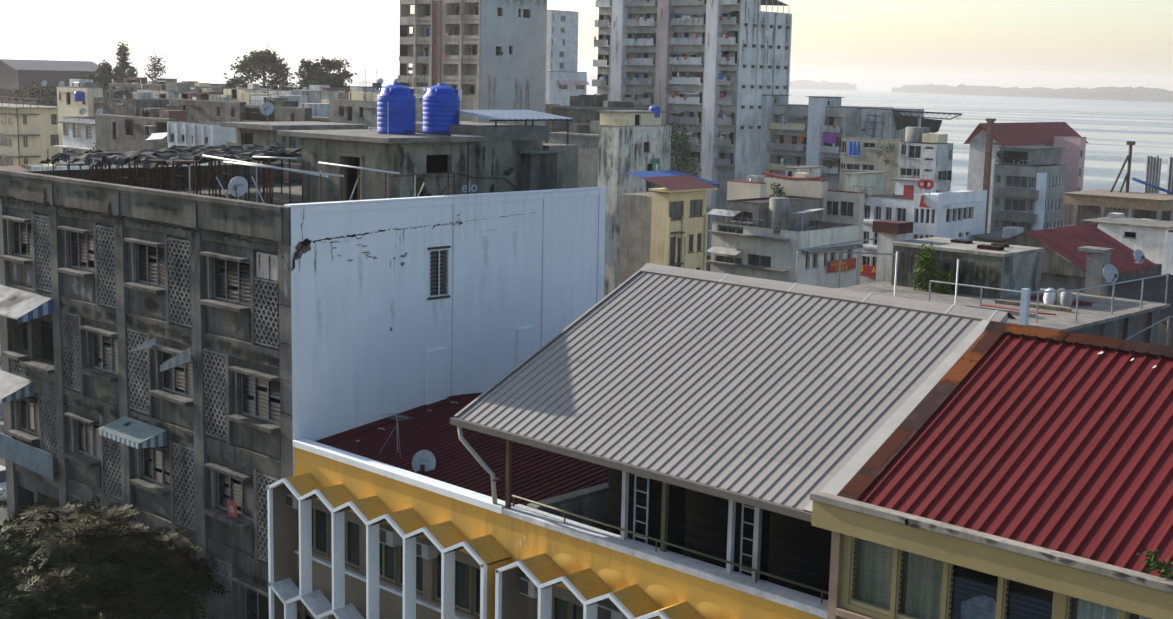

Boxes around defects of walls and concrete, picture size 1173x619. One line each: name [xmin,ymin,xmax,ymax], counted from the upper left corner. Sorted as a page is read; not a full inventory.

crack [0,195,536,245]
corrosion [840,427,913,496]